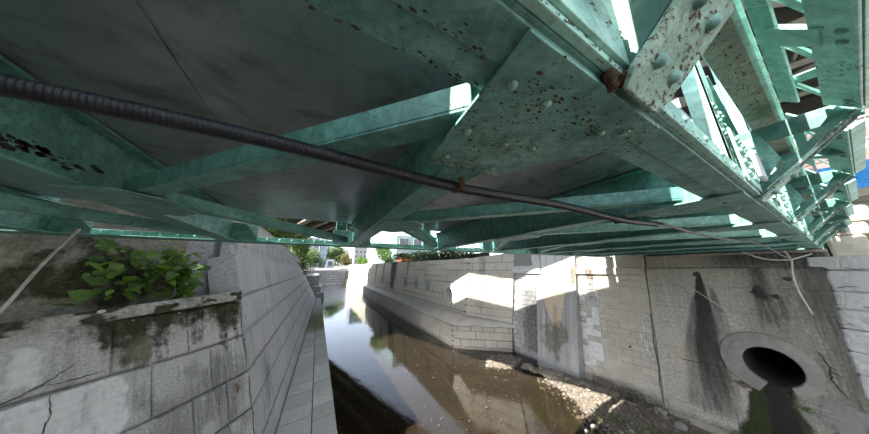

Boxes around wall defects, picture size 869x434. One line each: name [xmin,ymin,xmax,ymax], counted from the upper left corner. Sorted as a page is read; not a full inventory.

rust [519,71,619,144]
peeling [512,255,576,329]
leakage [727,252,823,305]
leakage [128,315,171,358]
leakage [216,304,237,364]
leakage [688,275,731,396]
crack [0,363,103,434]
crack [818,351,848,398]